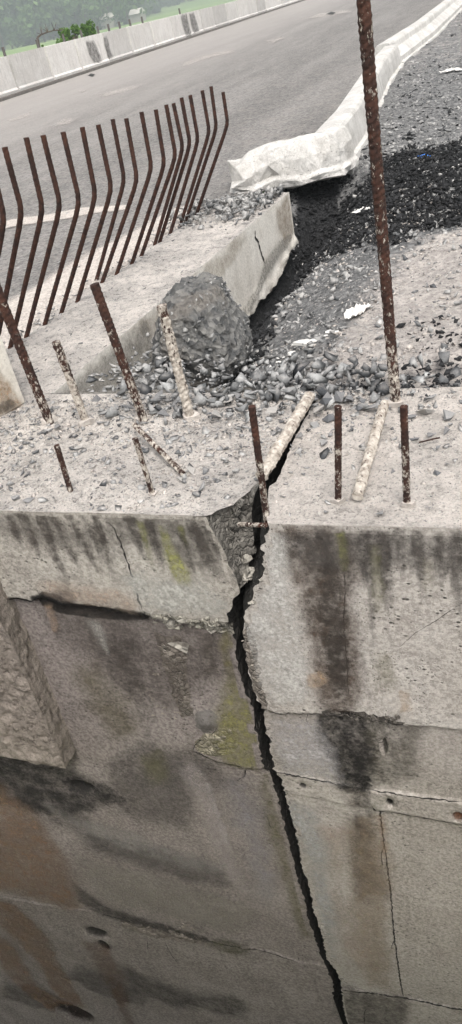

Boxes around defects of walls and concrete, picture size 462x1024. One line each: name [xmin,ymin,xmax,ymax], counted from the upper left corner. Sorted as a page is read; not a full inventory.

spalling [206,391,315,588]
leakage [7,513,107,571]
leakage [117,516,217,565]
leakage [250,526,462,802]
crack [106,400,462,1024]
leakage [0,756,122,826]
leakage [75,890,207,941]